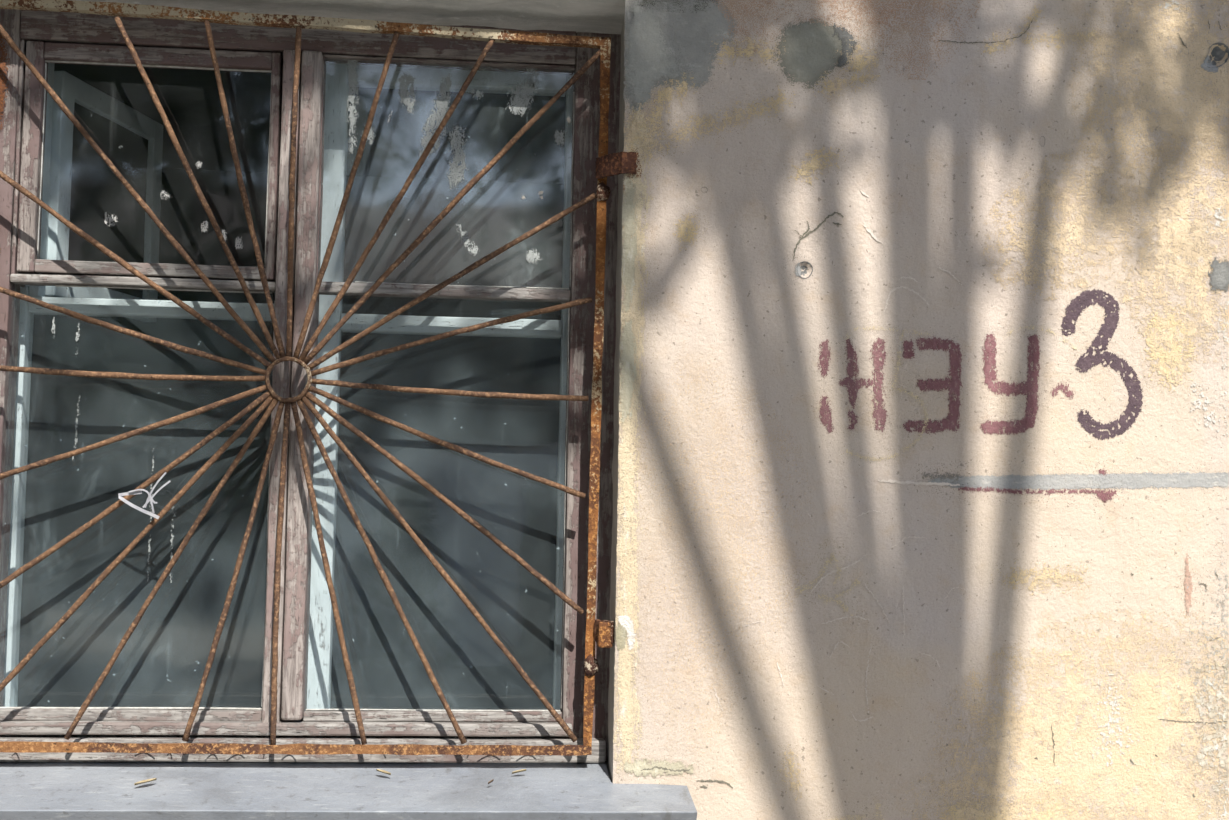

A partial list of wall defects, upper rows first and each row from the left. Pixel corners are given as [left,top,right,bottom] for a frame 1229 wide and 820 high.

rust [0,35,11,129]
peeling [613,103,694,778]
spalling [794,261,813,279]
peeling [982,0,1229,391]